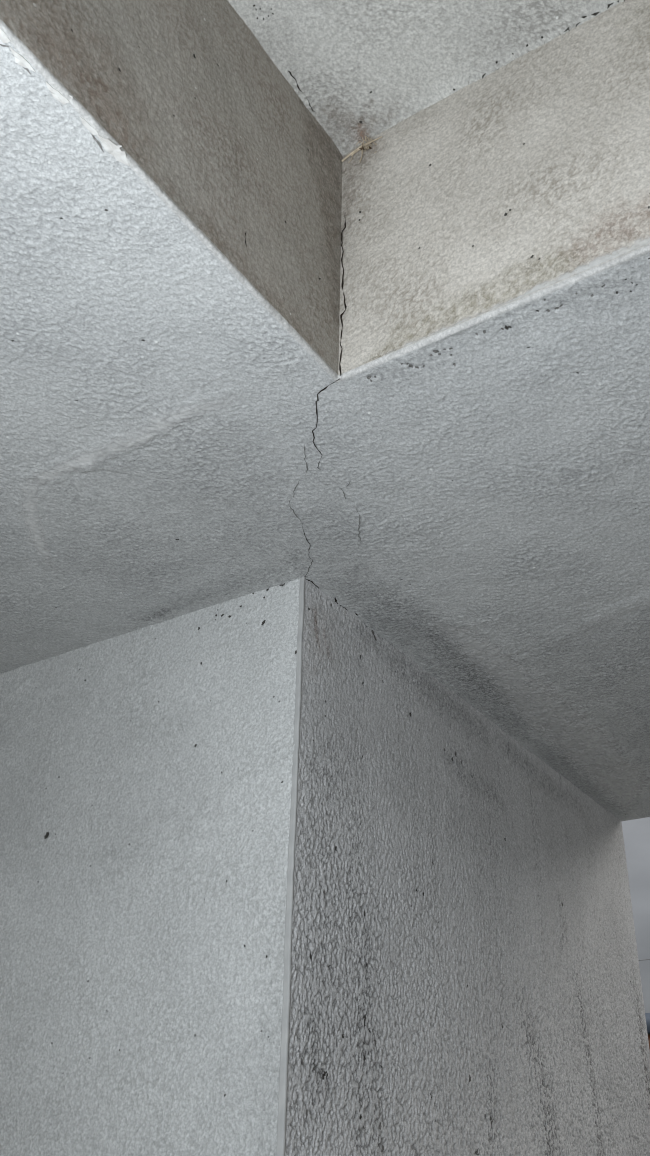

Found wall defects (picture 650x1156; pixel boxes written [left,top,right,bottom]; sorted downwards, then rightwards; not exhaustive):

crack [289,222,358,616]